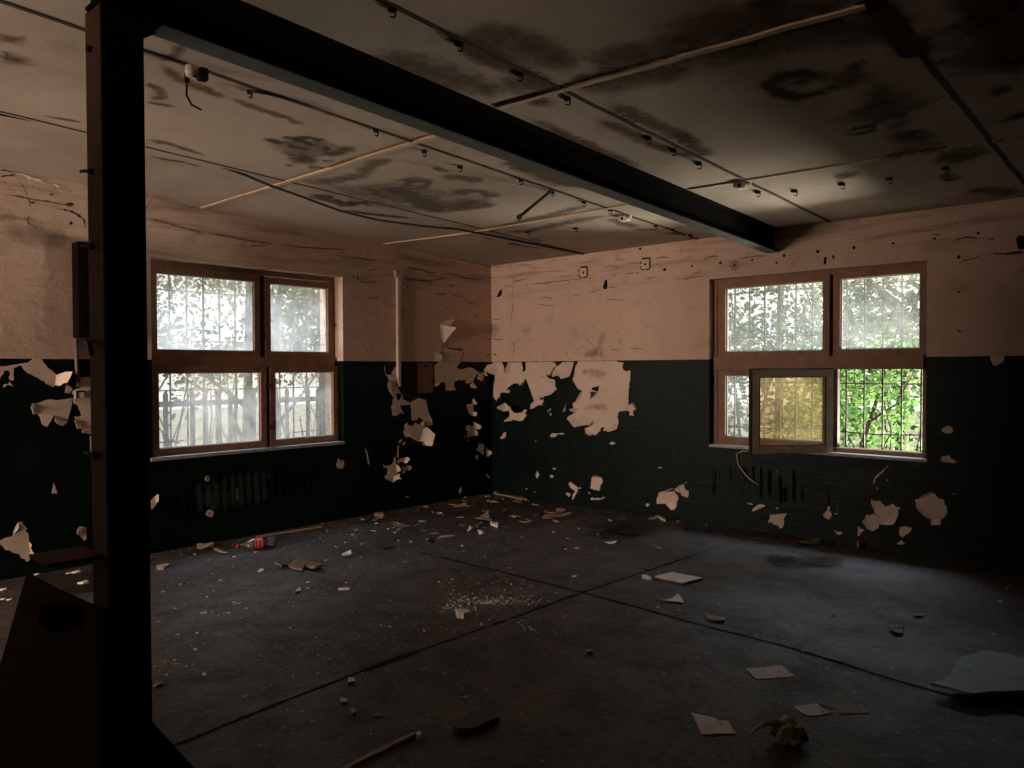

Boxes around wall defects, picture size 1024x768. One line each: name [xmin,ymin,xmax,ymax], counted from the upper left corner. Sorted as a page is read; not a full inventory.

damp [161,46,222,97]
damp [577,0,1024,91]
damp [761,61,865,101]
damp [238,101,498,218]
peeling [0,358,91,451]
peeling [383,366,435,483]
peeling [433,319,636,459]
peeling [0,522,34,562]
peeling [566,475,605,500]
peeling [645,482,689,510]
peeling [857,466,912,545]
peeling [915,492,947,525]